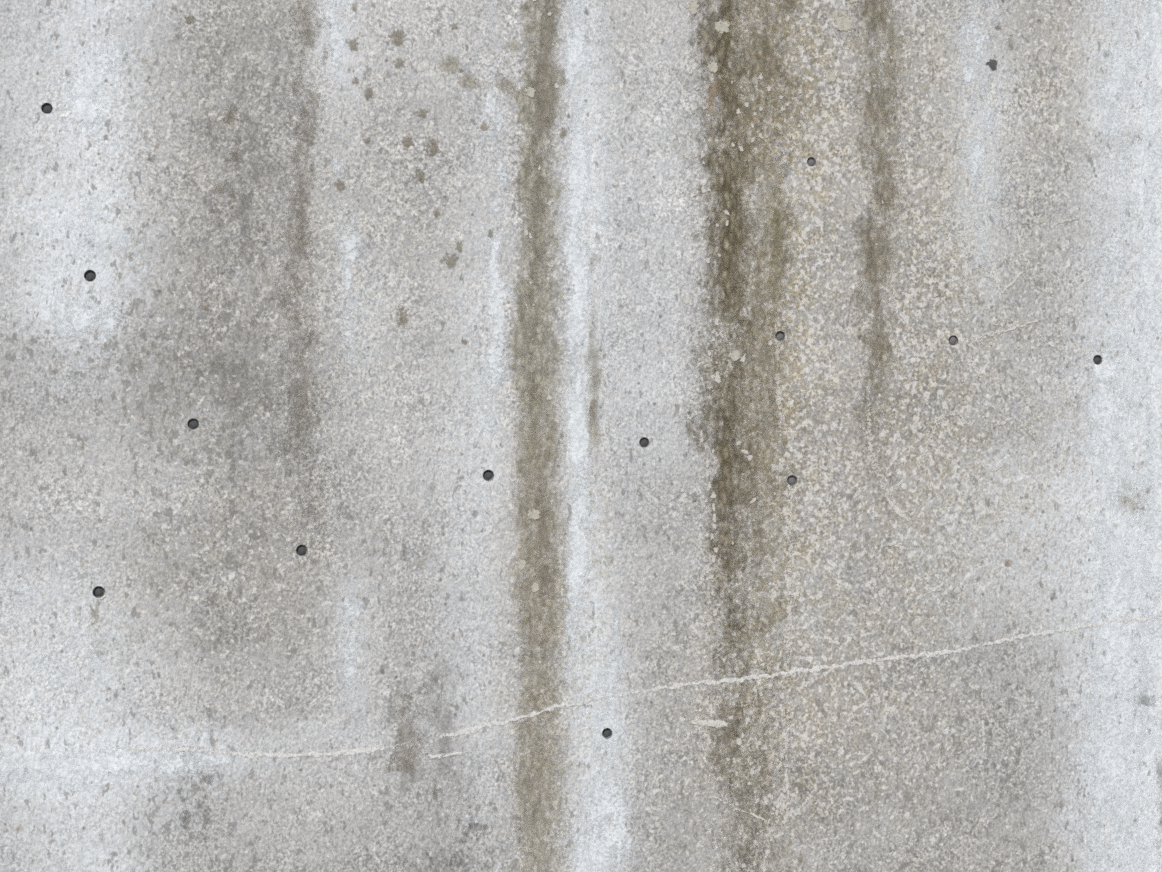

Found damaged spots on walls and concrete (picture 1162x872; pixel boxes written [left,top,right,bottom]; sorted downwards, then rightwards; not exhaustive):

water stain [547,0,609,654]
water stain [686,0,785,673]
water stain [574,651,633,872]
crack [118,614,1162,759]
water stain [719,708,772,763]
water stain [772,491,794,693]